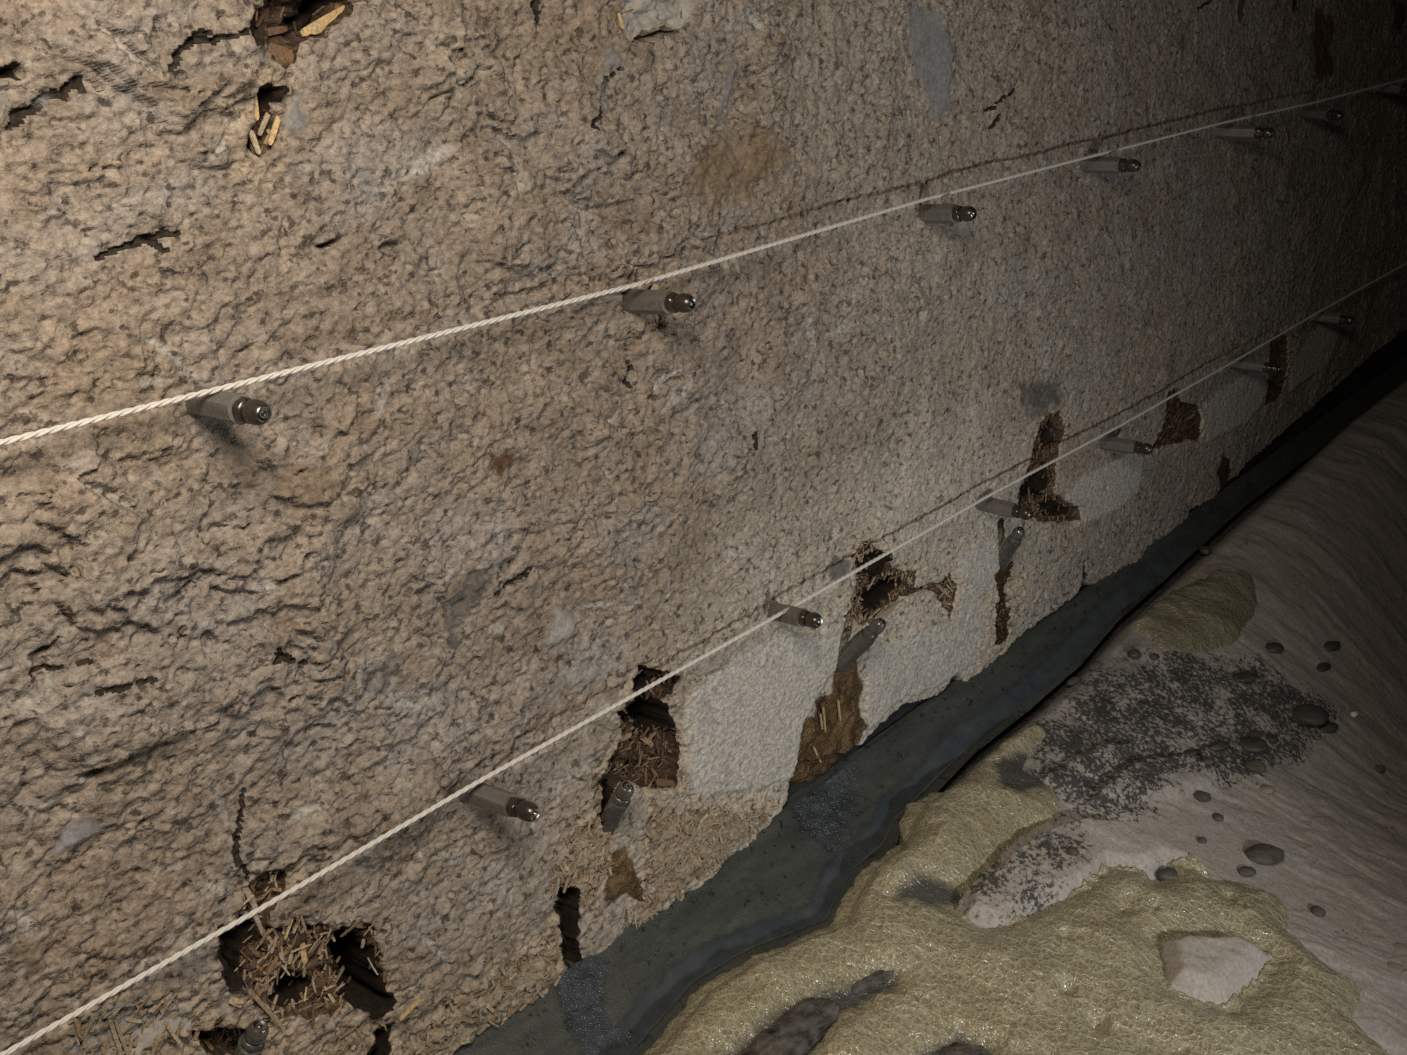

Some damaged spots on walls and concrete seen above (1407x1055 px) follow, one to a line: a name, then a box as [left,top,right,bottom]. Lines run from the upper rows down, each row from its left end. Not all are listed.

crack [0,61,87,130]
crack [167,27,250,72]
spalling [246,0,354,156]
crack [94,227,182,261]
spalling [1017,409,1081,528]
spalling [850,541,958,626]
crack [28,657,158,696]
crack [273,646,308,665]
spalling [599,665,682,825]
crack [231,787,250,879]
spalling [217,870,421,1029]
spalling [64,992,246,1055]